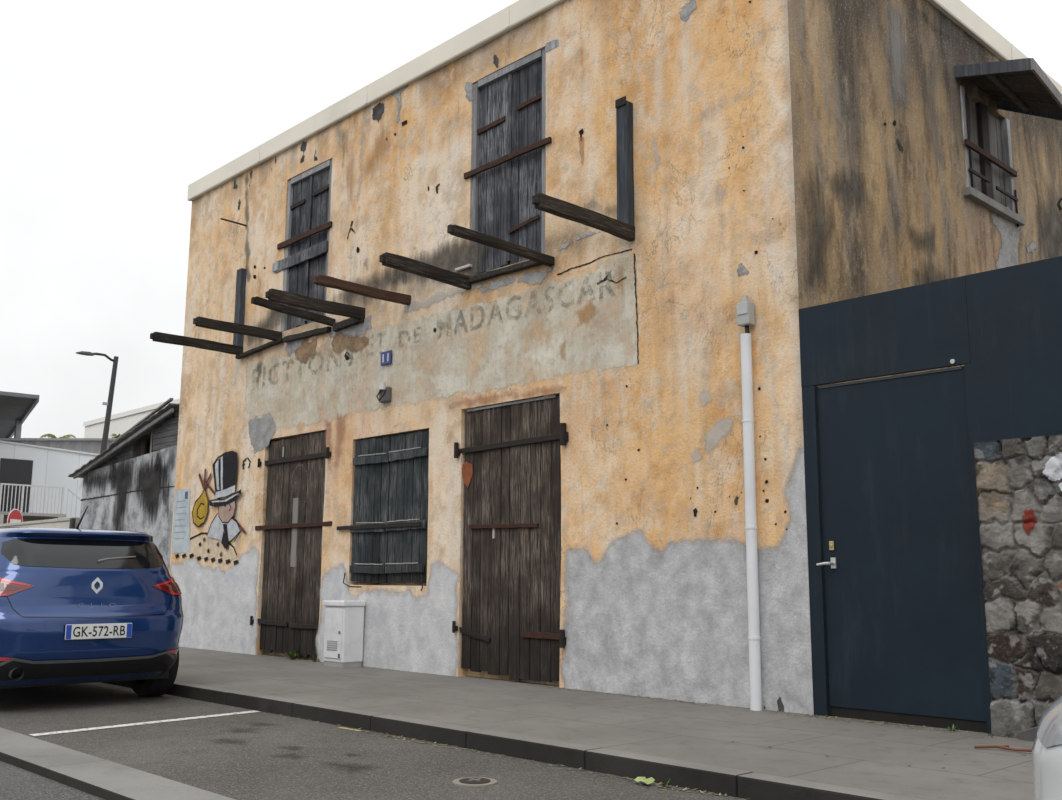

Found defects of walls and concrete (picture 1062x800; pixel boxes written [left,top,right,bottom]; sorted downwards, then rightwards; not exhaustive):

flaking render [679,0,696,21]
leakage [415,239,482,276]
leakage [810,173,862,286]
flaking render [990,207,1037,269]
leakage [343,268,425,304]
flaking render [285,316,372,364]
flaking render [248,413,275,453]
leakage [85,456,174,531]